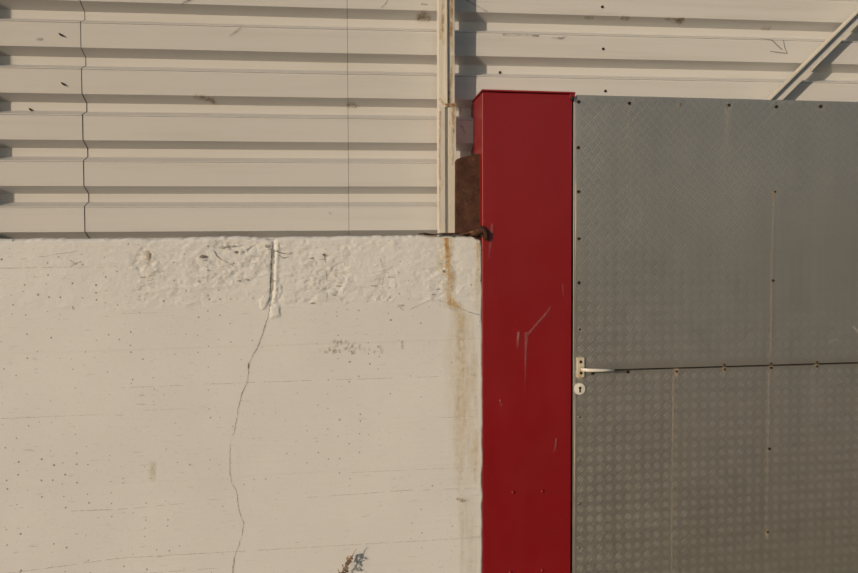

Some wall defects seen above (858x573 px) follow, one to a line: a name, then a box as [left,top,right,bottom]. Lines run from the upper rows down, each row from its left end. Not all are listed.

crack [229,249,291,573]
rust [444,238,456,308]